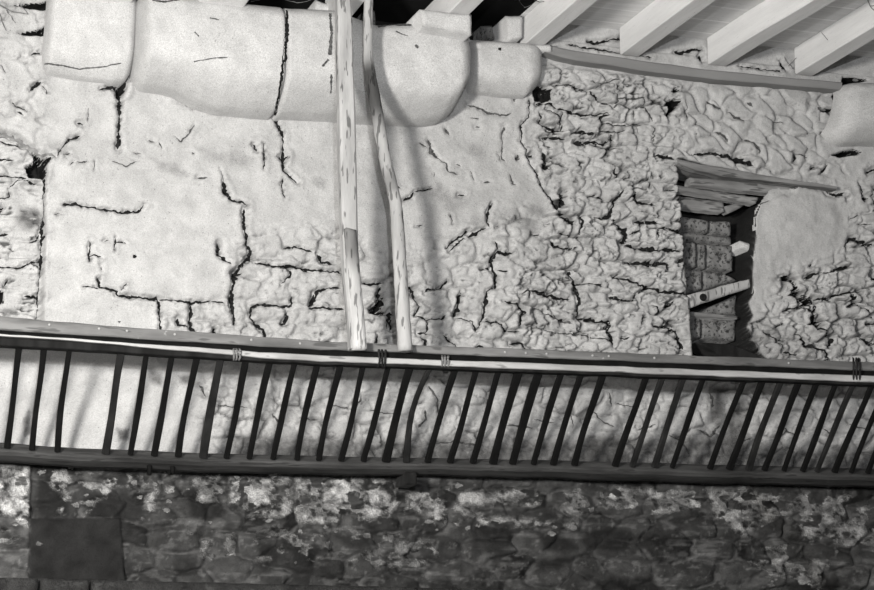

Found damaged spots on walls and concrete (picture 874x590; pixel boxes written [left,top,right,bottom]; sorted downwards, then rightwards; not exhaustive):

crack [0,53,194,318]
crack [252,10,296,197]
crack [398,128,498,251]
crack [467,99,561,210]
crack [82,172,252,333]
peeling [0,467,29,543]
peeling [38,467,182,514]
peeling [186,473,438,572]
peeling [407,483,874,590]